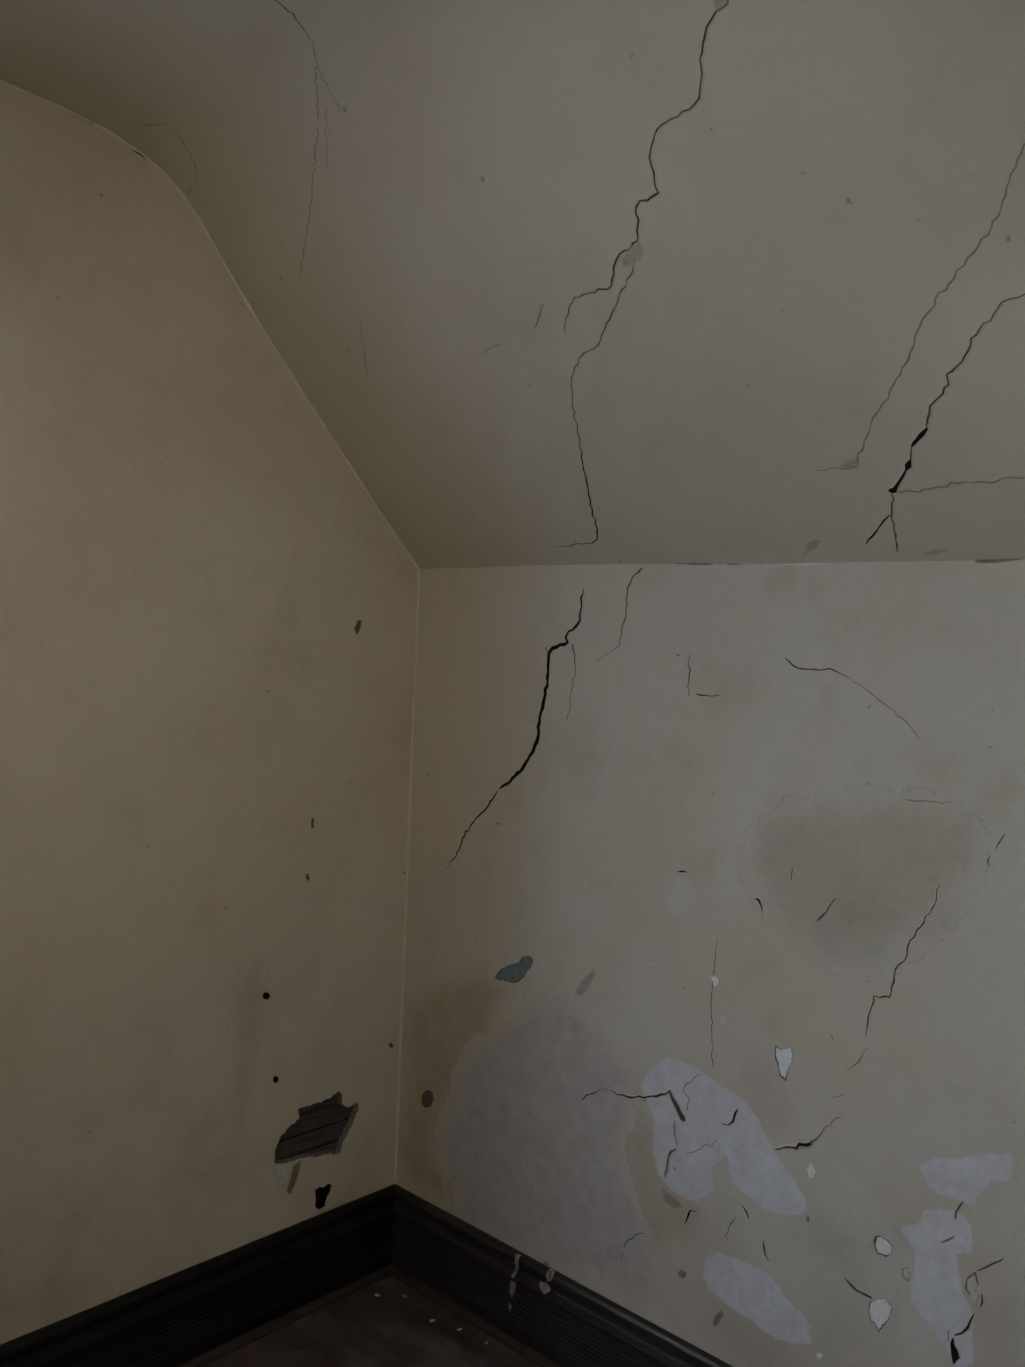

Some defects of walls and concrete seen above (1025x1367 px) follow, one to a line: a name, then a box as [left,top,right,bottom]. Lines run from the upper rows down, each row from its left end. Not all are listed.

crack [275,0,340,280]
crack [535,0,731,548]
crack [817,143,1025,471]
crack [864,291,1025,553]
crack [436,567,643,879]
flaking render [274,1091,359,1185]
flaking render [495,956,533,983]
peeling [421,985,816,1305]
peeling [701,1251,823,1359]
crack [774,884,941,1152]
peeling [869,1151,1014,1367]
crack [947,1256,1005,1365]